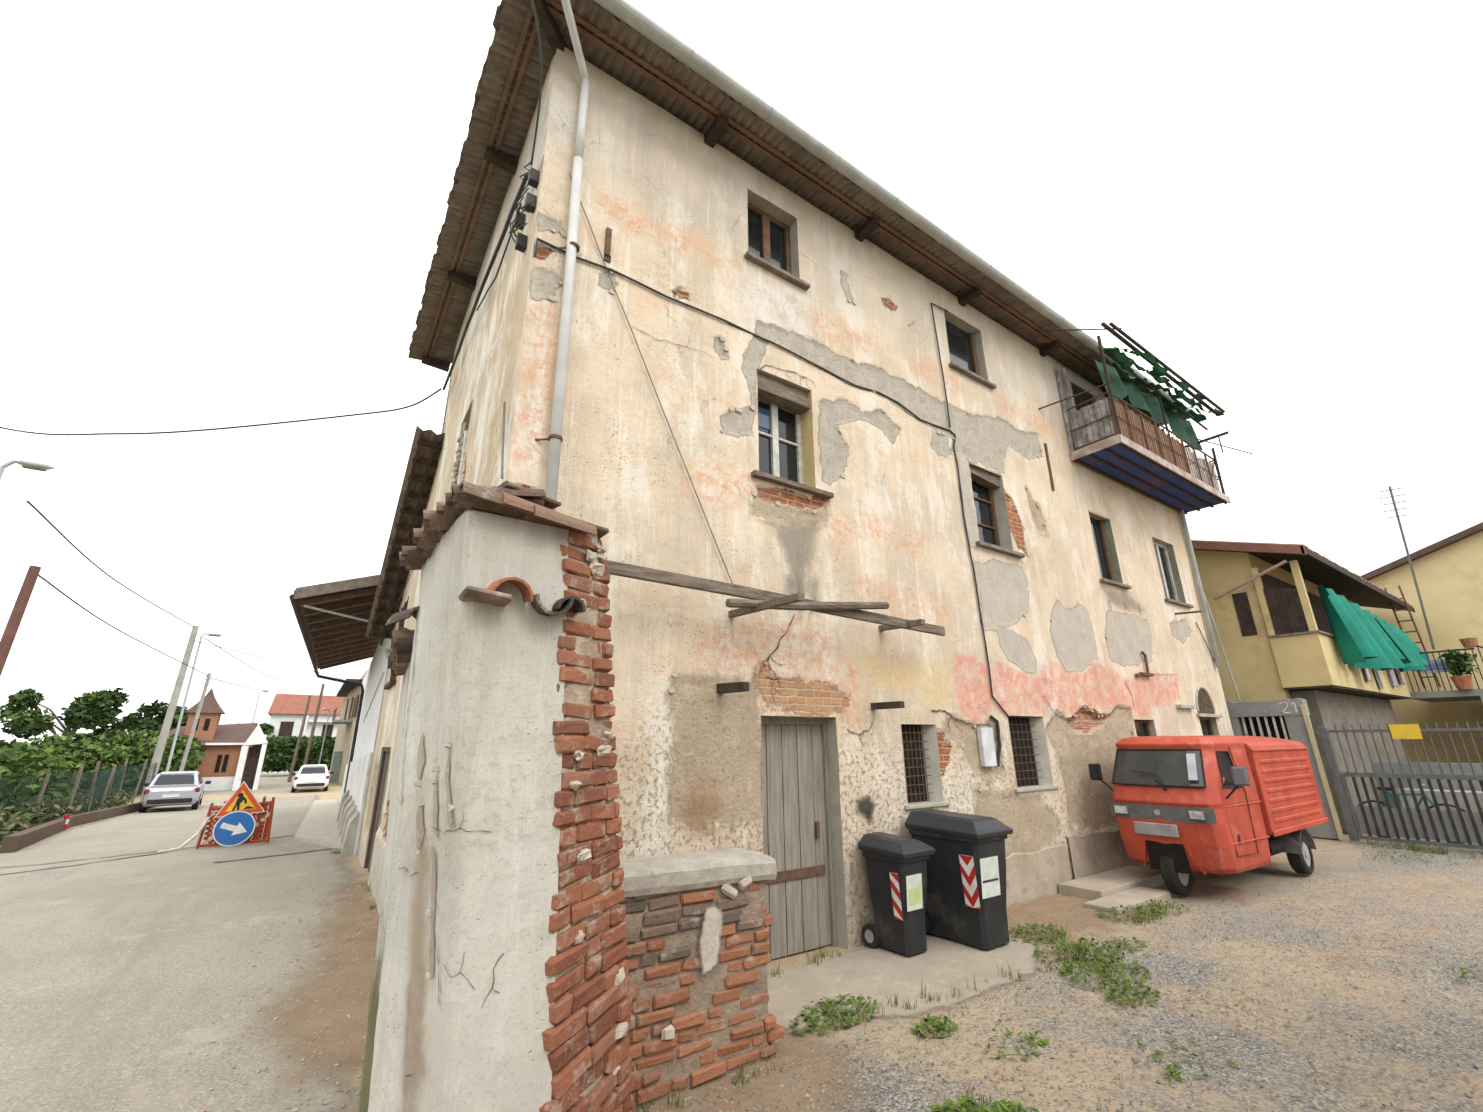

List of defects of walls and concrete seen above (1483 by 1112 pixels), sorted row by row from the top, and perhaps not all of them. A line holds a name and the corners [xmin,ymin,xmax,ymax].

flaking render [713,321,1047,556]
crack [432,814,491,834]
crack [437,950,504,1009]